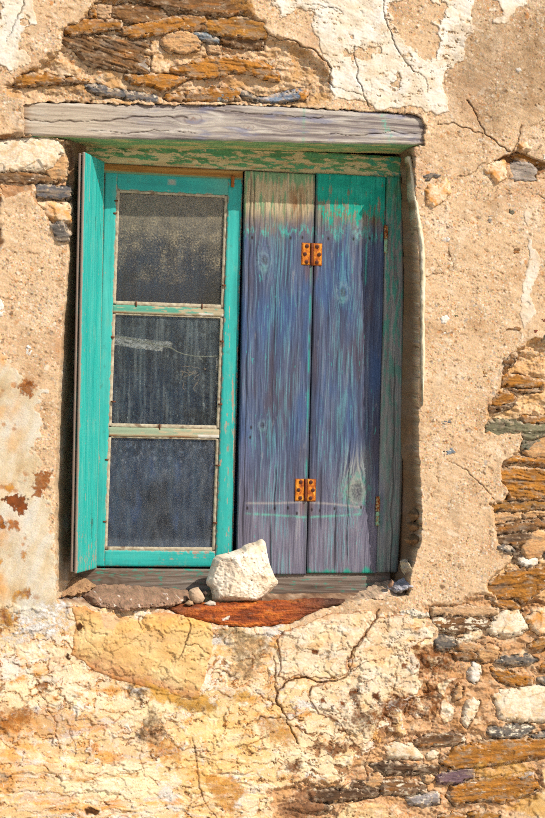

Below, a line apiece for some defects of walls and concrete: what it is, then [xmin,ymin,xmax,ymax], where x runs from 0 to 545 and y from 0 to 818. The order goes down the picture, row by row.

spalling [0,0,475,115]
spalling [494,142,545,182]
spalling [266,239,545,818]
crack [260,611,378,718]